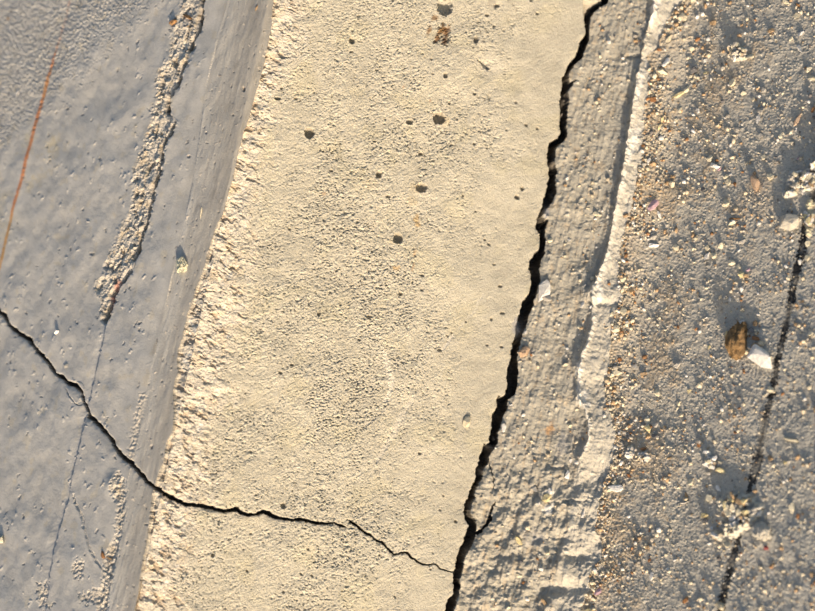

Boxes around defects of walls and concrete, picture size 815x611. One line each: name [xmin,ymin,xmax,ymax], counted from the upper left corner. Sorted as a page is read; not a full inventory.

spalling [93,0,207,325]
crack [0,0,609,611]